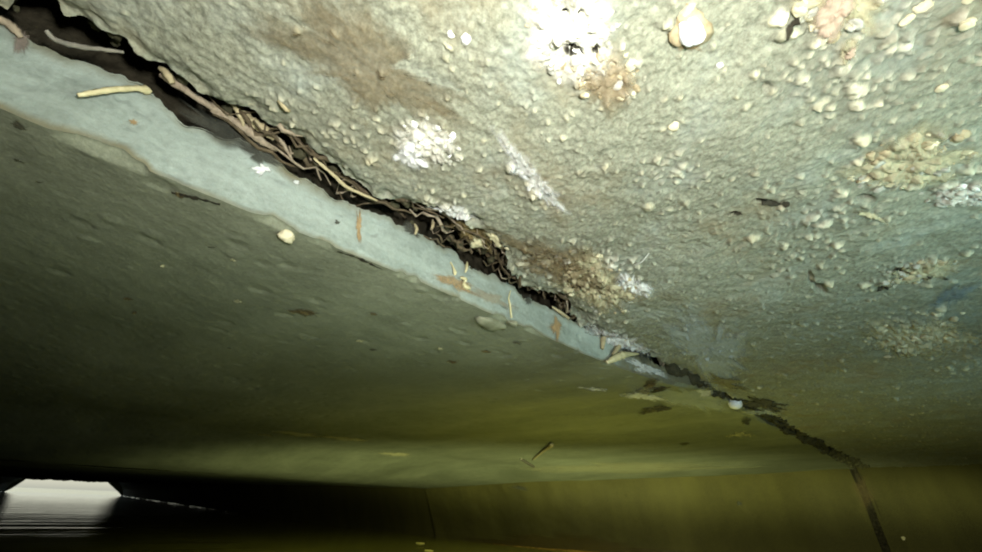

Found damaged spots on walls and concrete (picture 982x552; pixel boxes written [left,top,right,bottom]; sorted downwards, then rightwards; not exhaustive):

crack [786,17,800,41]
crack [0,0,592,329]
efflorescence [394,142,428,168]
damp [918,178,982,208]
crack [728,198,790,215]
efflorescence [618,274,651,295]
crack [877,268,949,292]
crack [622,347,891,552]